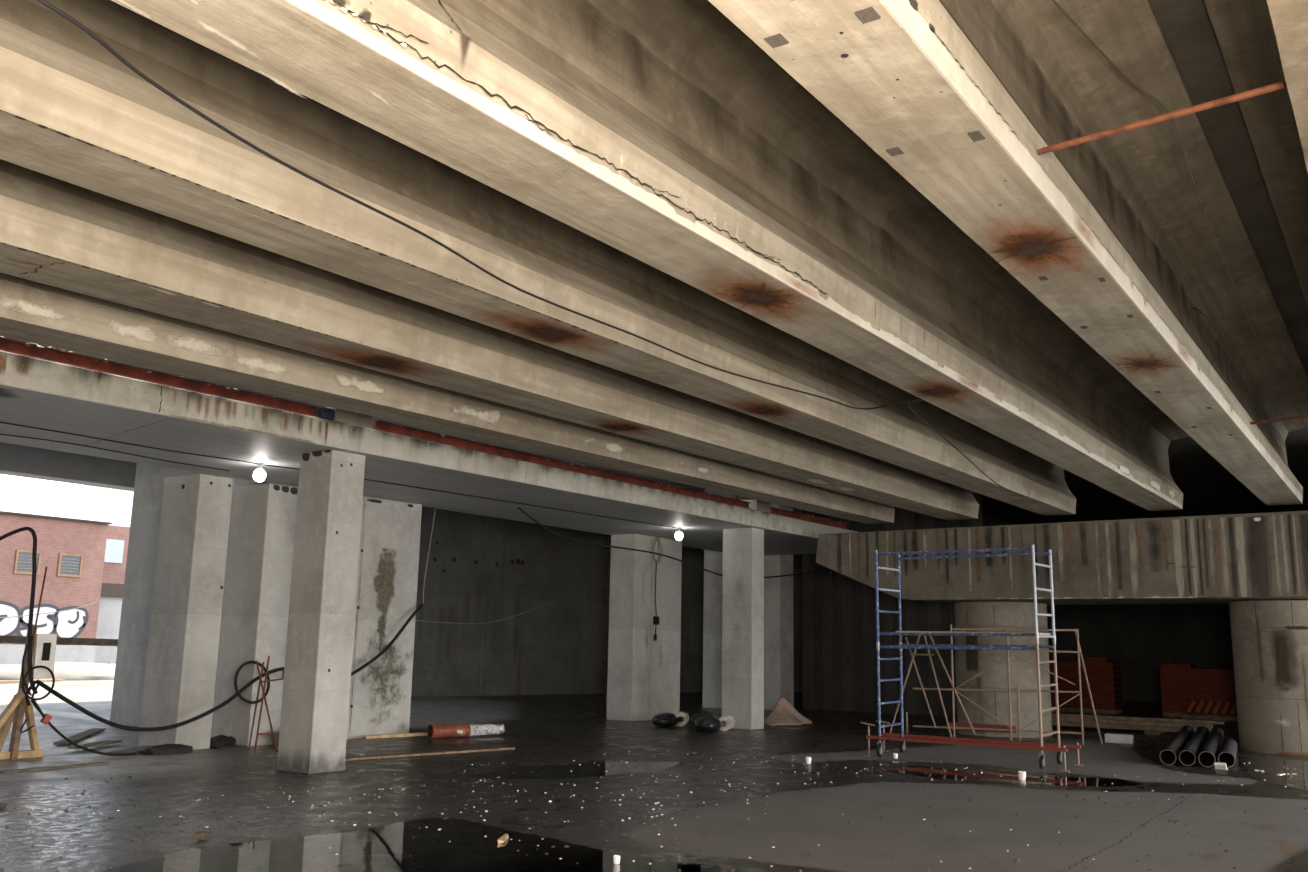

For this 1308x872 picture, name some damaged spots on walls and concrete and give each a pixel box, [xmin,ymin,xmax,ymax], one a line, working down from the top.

crack [337,0,827,294]
rust [996,227,1074,267]
rust [717,281,799,314]
rust [497,317,585,344]
peeling [238,357,287,374]
rust [337,352,424,373]
peeling [336,375,385,393]
rust [916,383,958,400]
rust [179,395,328,443]
peeling [454,406,501,422]
peeling [586,439,622,452]
damp [362,548,406,704]